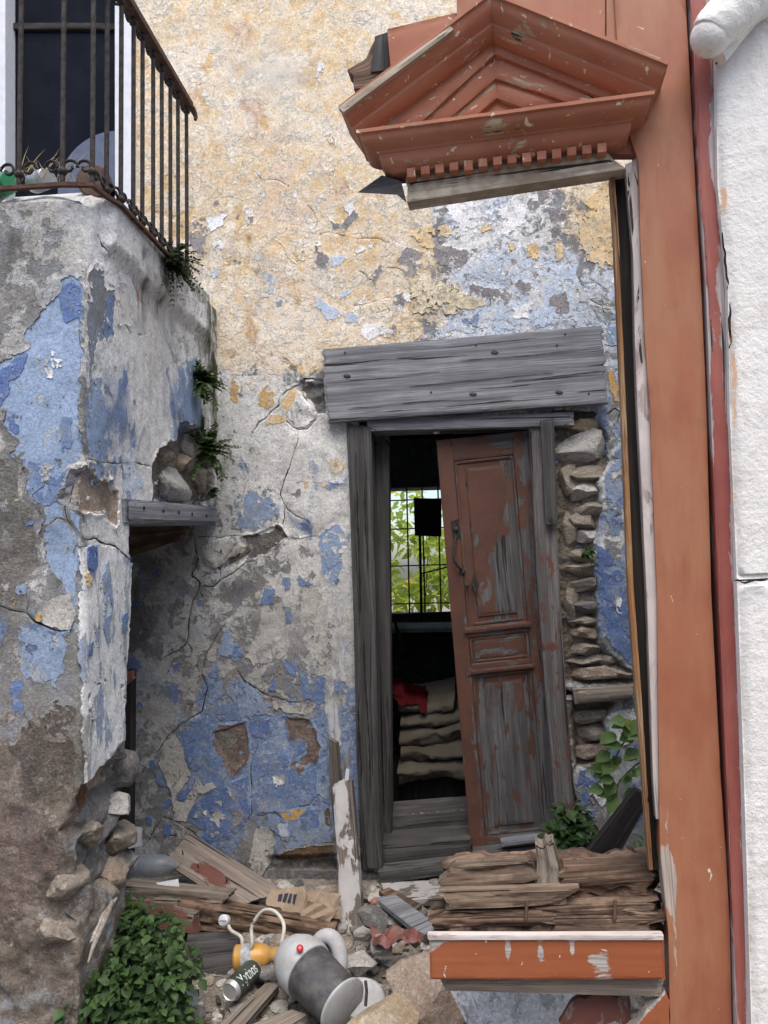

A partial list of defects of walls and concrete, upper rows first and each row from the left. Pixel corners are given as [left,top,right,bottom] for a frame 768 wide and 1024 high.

peeling [184,213,228,261]
peeling [293,241,365,270]
peeling [325,201,360,236]
peeling [369,182,613,340]
peeling [312,289,395,343]
peeling [601,312,617,344]
flaking render [228,375,328,428]
crack [0,593,70,636]
peeling [0,245,291,933]
crack [153,375,346,759]
flaking render [549,406,636,820]
peeling [148,521,351,879]